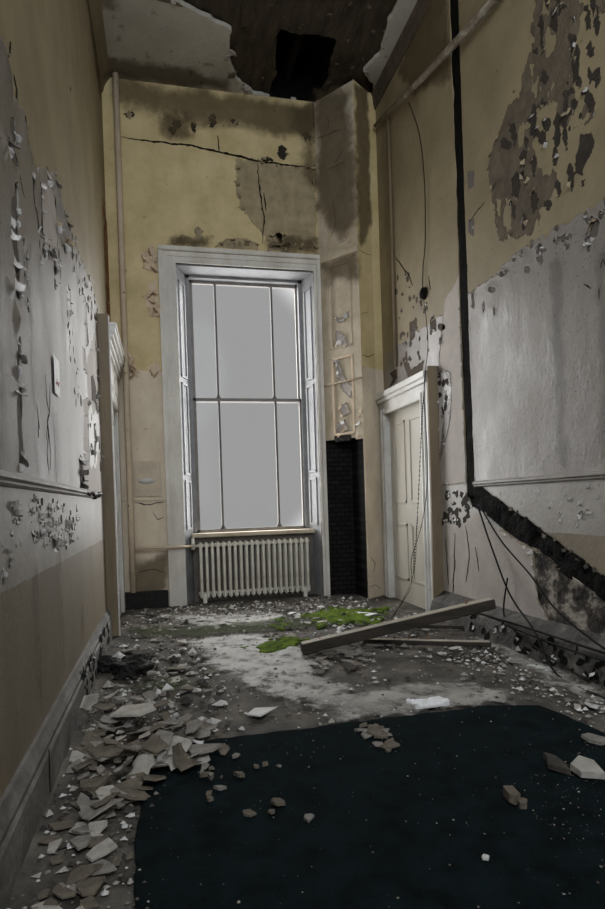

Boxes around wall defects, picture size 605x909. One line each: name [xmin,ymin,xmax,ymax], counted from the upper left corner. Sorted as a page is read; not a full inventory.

spalling [158,0,397,96]
damp [88,0,371,243]
peeling [486,0,605,273]
crack [125,135,305,244]
damp [172,238,207,247]
damp [273,236,315,252]
damp [323,253,358,278]
peeling [11,167,110,493]
crack [37,375,51,470]
flaking render [389,272,547,621]
peeling [32,496,78,550]
peeling [83,623,112,695]